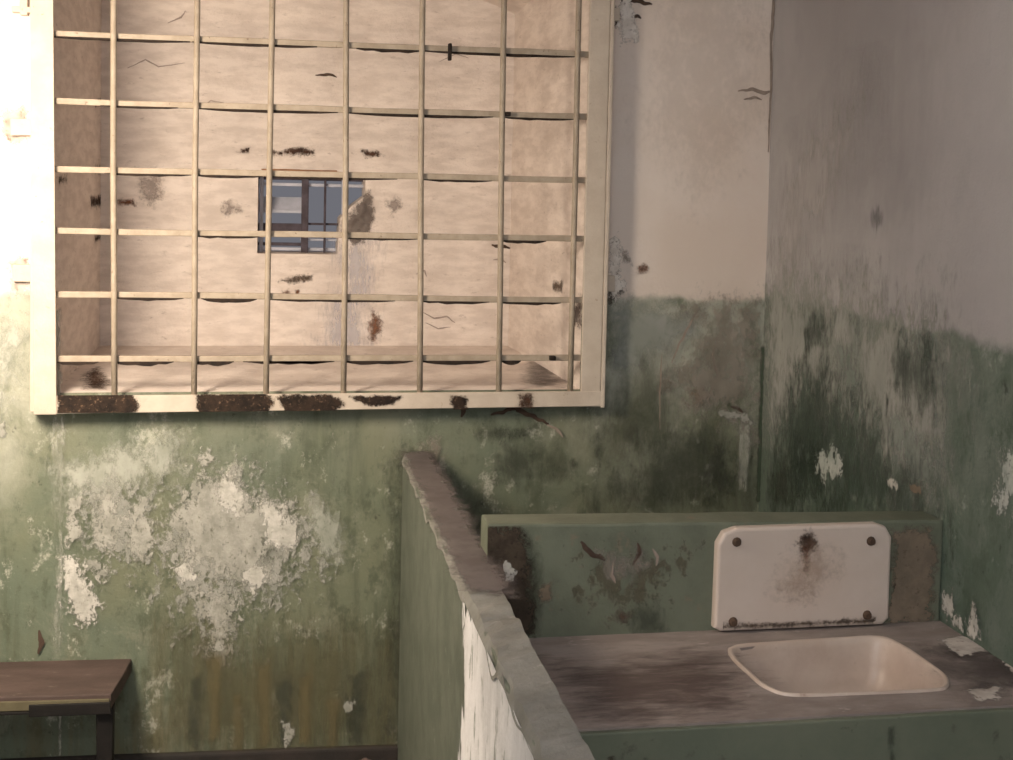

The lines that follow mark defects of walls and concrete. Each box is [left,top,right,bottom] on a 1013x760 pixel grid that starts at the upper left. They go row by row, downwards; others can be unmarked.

water stain [756,347,765,502]
water stain [773,368,900,504]
peeling [991,446,1013,519]
peeling [49,432,352,682]
spalling [487,526,536,635]
peeling [580,541,659,583]